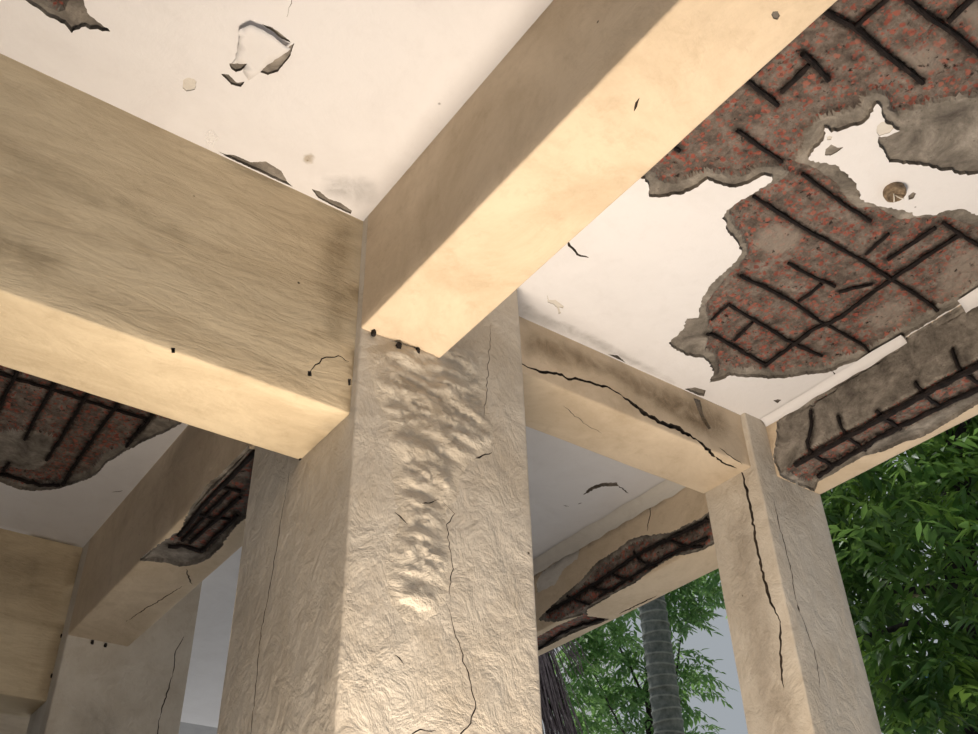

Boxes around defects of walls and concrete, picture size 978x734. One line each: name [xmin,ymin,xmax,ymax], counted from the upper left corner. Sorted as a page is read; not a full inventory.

spalling [26,0,110,33]
spalling [641,0,978,492]
spalling [0,365,182,491]
spalling [140,445,255,567]
crack [422,499,476,734]
spalling [536,512,714,651]
crack [522,364,820,688]